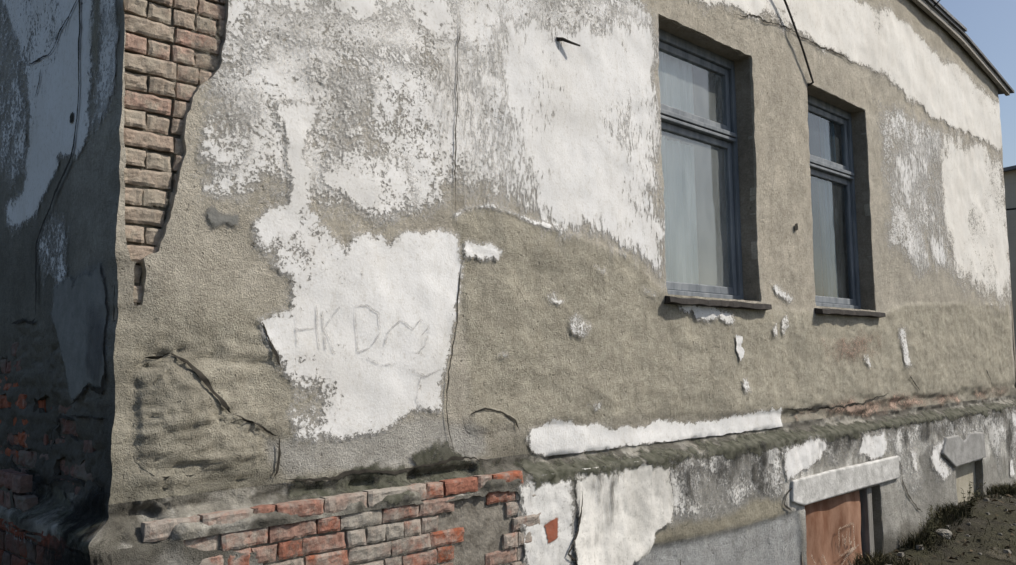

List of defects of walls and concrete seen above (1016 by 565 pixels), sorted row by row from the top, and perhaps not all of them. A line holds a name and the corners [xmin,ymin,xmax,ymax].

crack [12,0,81,324]
peeling [0,0,666,442]
crack [453,12,461,226]
flaking render [0,376,96,565]
damp [43,478,112,565]
crack [144,261,520,481]
flaking render [140,407,1016,565]
peeling [679,305,745,361]
spalling [831,394,960,417]
peeling [898,328,912,366]